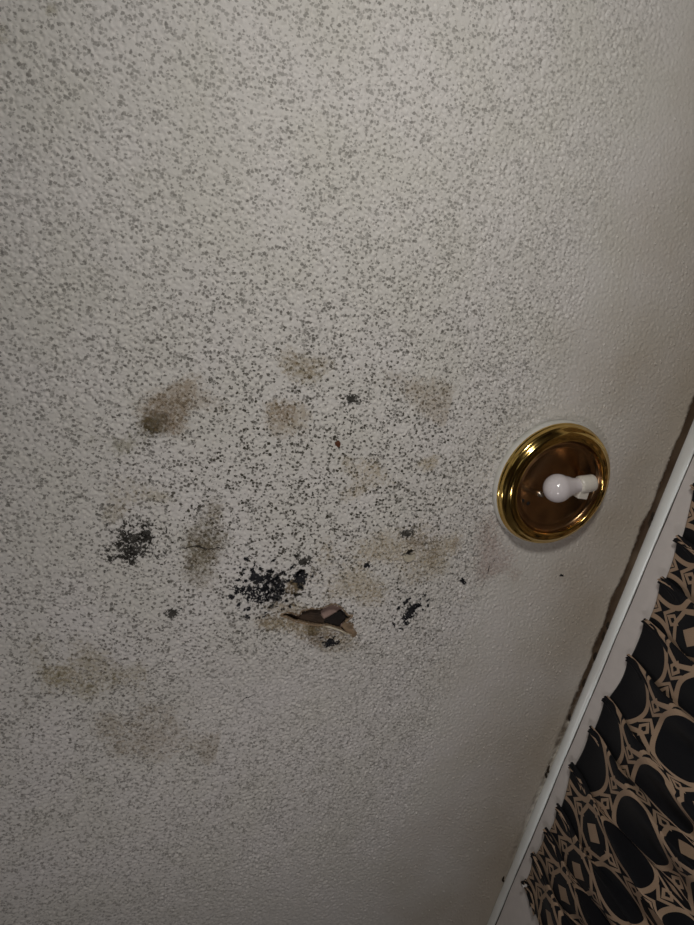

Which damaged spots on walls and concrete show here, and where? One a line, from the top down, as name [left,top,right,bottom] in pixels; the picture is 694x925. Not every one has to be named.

mould [95,511,170,575]
mould [226,552,314,619]
mould [387,593,430,630]